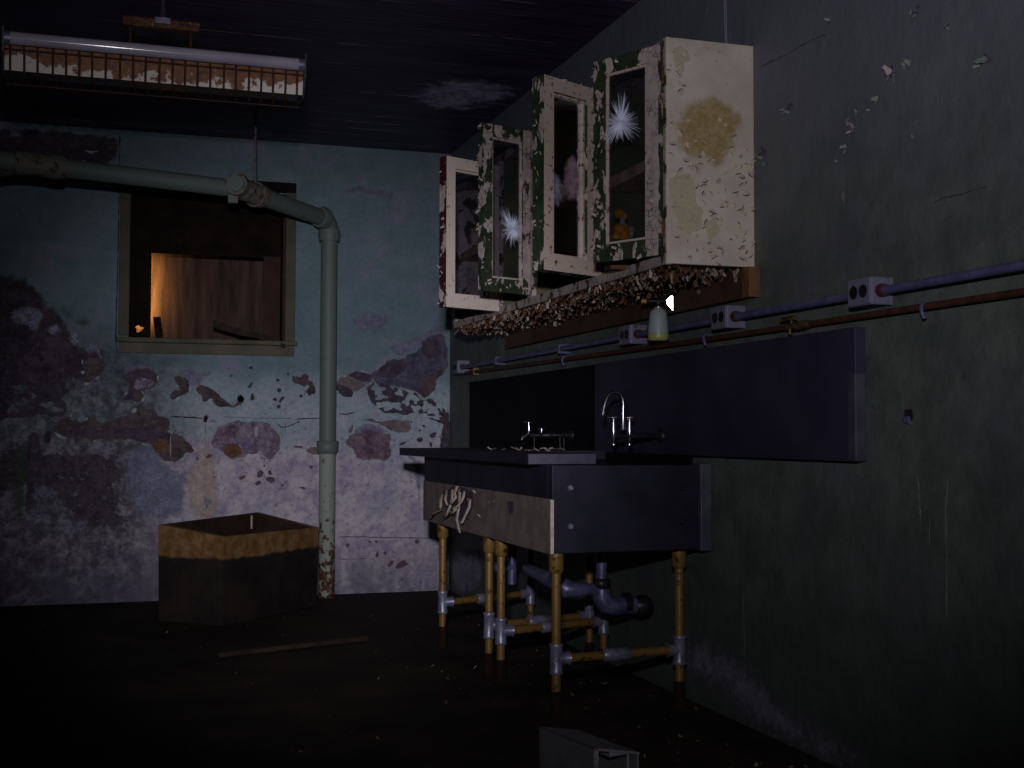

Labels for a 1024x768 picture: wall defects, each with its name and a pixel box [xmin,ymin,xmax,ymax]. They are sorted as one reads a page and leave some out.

damp [0,275,105,400]
damp [0,431,186,528]
peeling [170,364,319,487]
spalling [336,369,450,462]